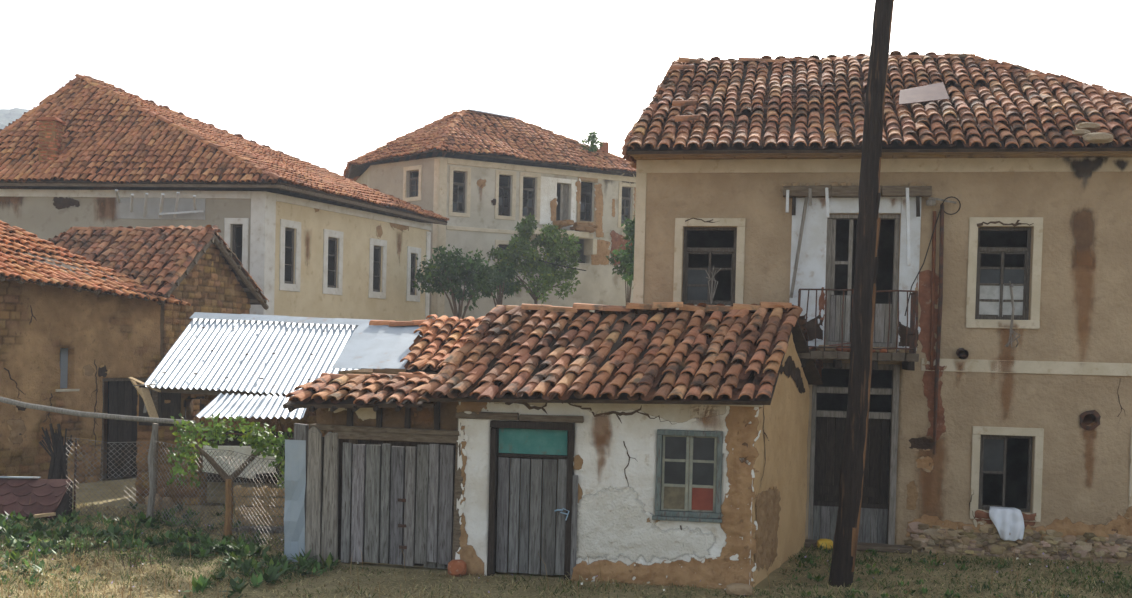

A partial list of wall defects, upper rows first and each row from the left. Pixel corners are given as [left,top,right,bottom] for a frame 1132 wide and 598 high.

damp [1063,156,1128,186]
damp [1071,209,1095,353]
spalling [456,402,505,576]
crack [505,402,677,486]
damp [594,415,610,469]
spalling [571,403,781,590]